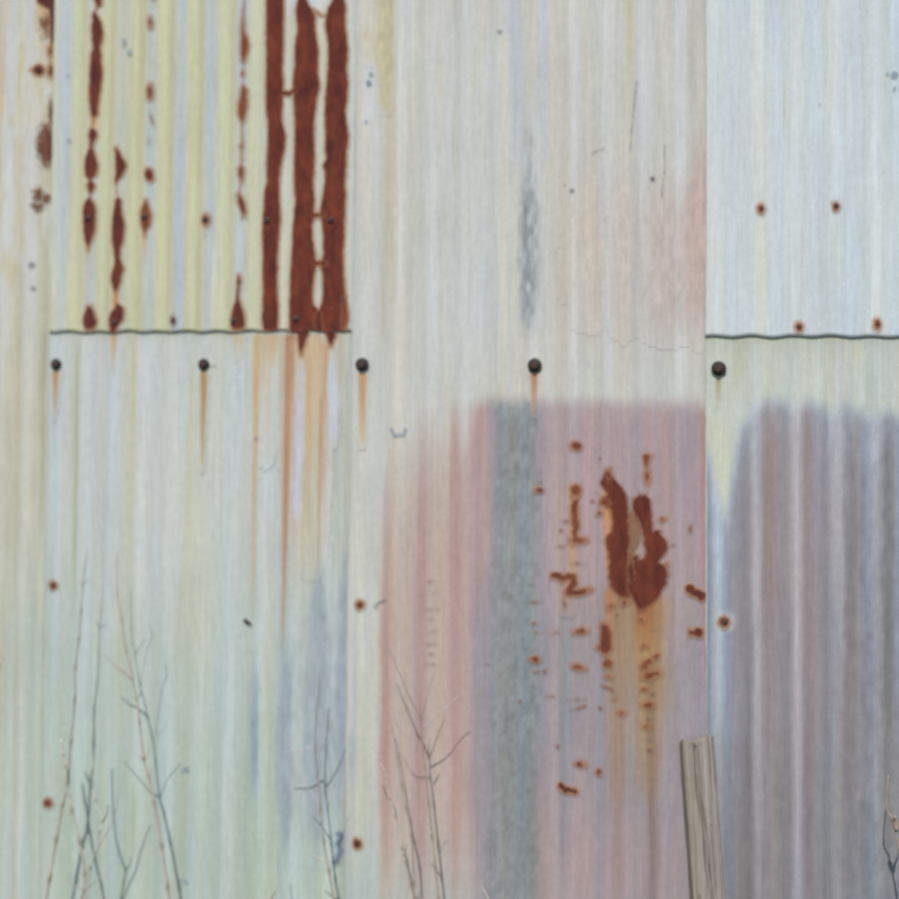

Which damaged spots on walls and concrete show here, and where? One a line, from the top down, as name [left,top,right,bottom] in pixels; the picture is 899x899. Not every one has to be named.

rust [29,0,54,76]
rust [33,94,53,171]
rust [30,184,51,213]
rust [82,0,127,376]
rust [139,198,152,262]
rust [144,167,155,182]
rust [230,0,350,656]
rust [717,615,731,629]
rust [549,453,706,899]